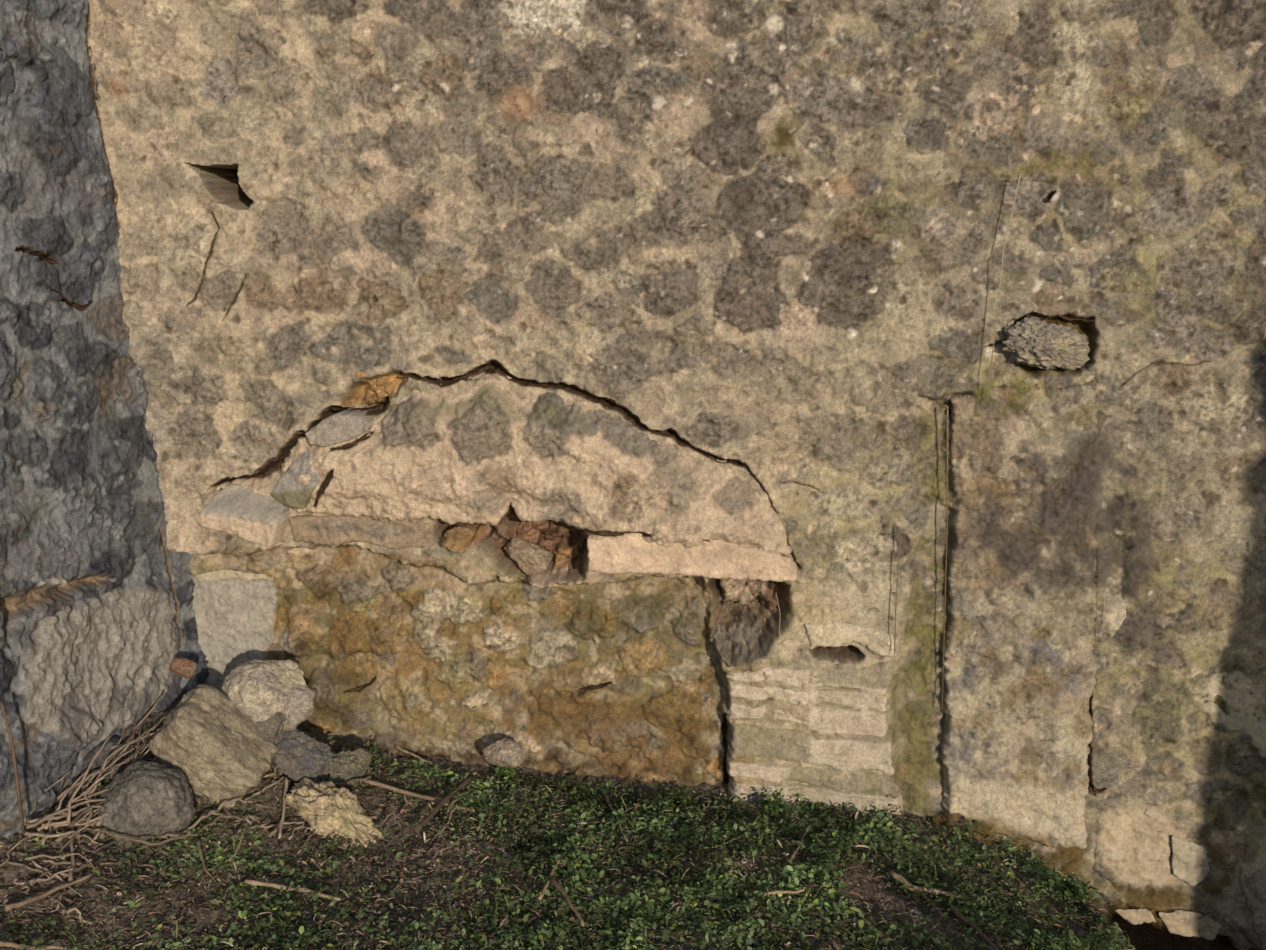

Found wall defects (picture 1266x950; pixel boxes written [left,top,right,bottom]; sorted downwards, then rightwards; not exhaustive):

crack [186,212,220,306]
crack [222,274,246,321]
spalling [1008,310,1103,385]
crack [213,361,824,570]
spalling [427,505,589,588]
peeling [191,570,279,694]
spalling [704,578,867,668]
crack [1087,695,1107,796]